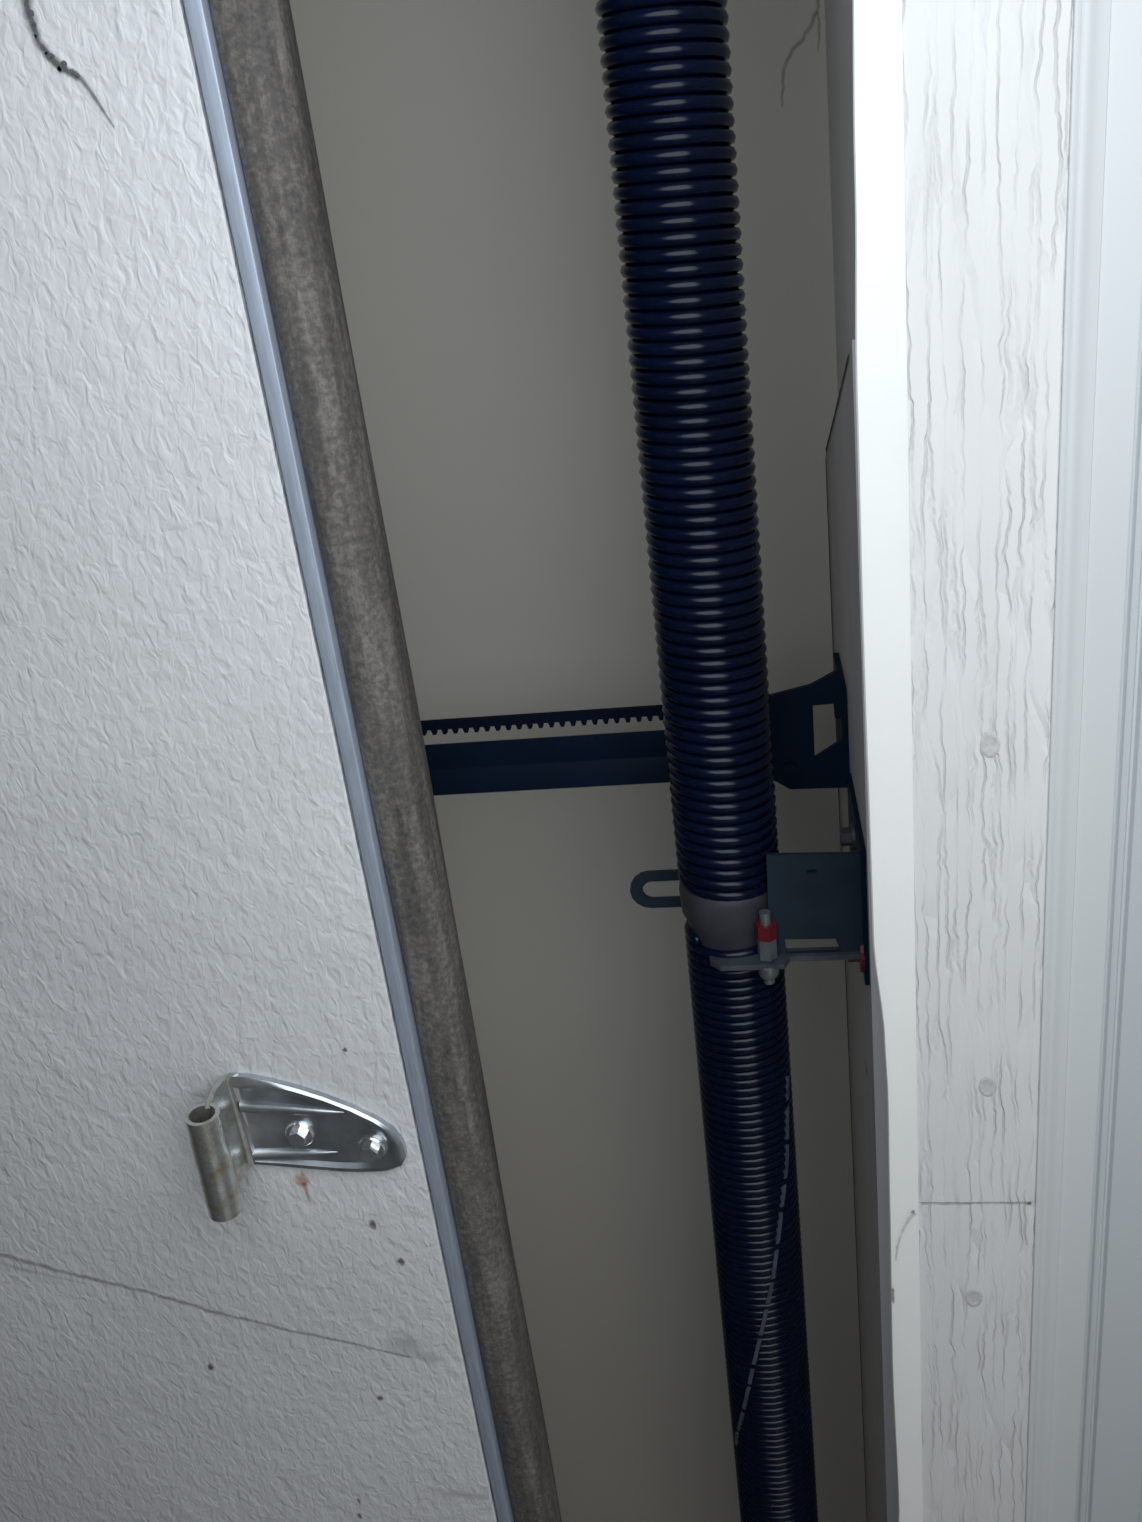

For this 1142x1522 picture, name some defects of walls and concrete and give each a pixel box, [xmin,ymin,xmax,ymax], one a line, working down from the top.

crack [24,0,114,127]